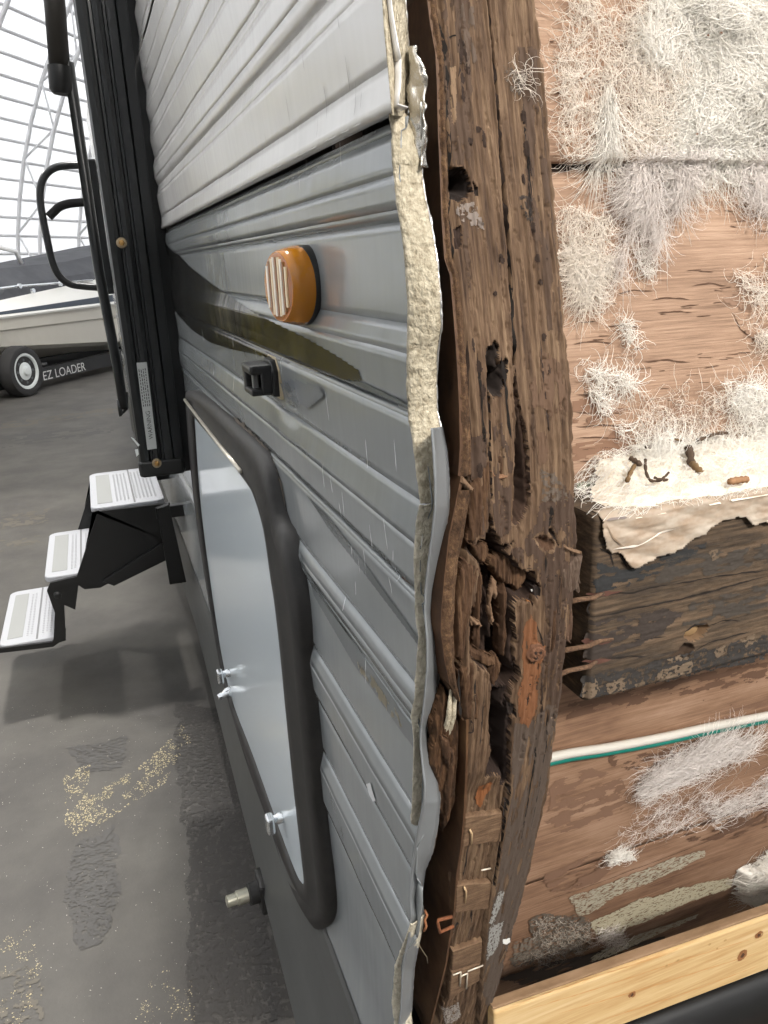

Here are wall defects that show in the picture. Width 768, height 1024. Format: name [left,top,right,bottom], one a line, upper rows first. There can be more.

hole [447,166,478,202]
hole [535,528,559,552]
spalling [465,338,541,960]
corrosion [518,616,546,728]
water stain [467,422,768,1008]
peeling [582,642,695,699]